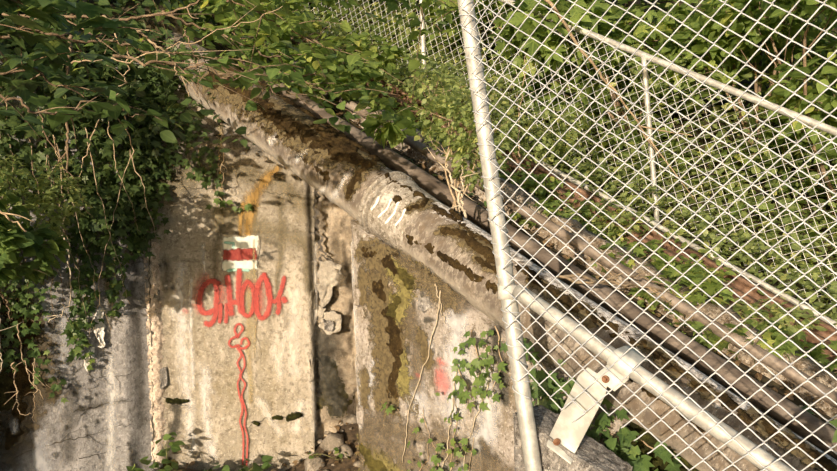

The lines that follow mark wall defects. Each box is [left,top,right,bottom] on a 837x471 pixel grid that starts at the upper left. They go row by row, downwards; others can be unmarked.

rust [238,165,279,237]
leakage [371,196,406,226]
spalling [309,260,342,335]
spalling [352,287,361,306]
leakage [448,312,463,415]
spalling [356,403,365,426]
leakage [473,377,493,453]